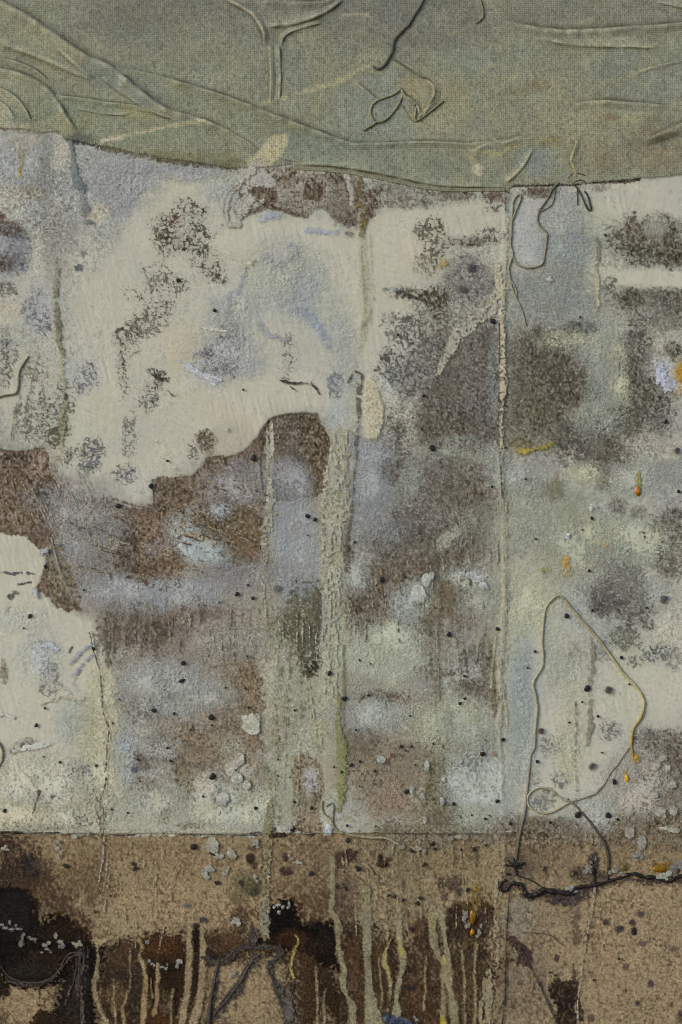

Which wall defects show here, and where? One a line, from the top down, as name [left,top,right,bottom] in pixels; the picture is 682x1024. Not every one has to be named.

peeling [0,448,88,612]
peeling [144,412,331,554]
water stain [0,827,107,1024]
water stain [376,854,392,868]
water stain [437,875,463,899]
water stain [507,936,532,969]